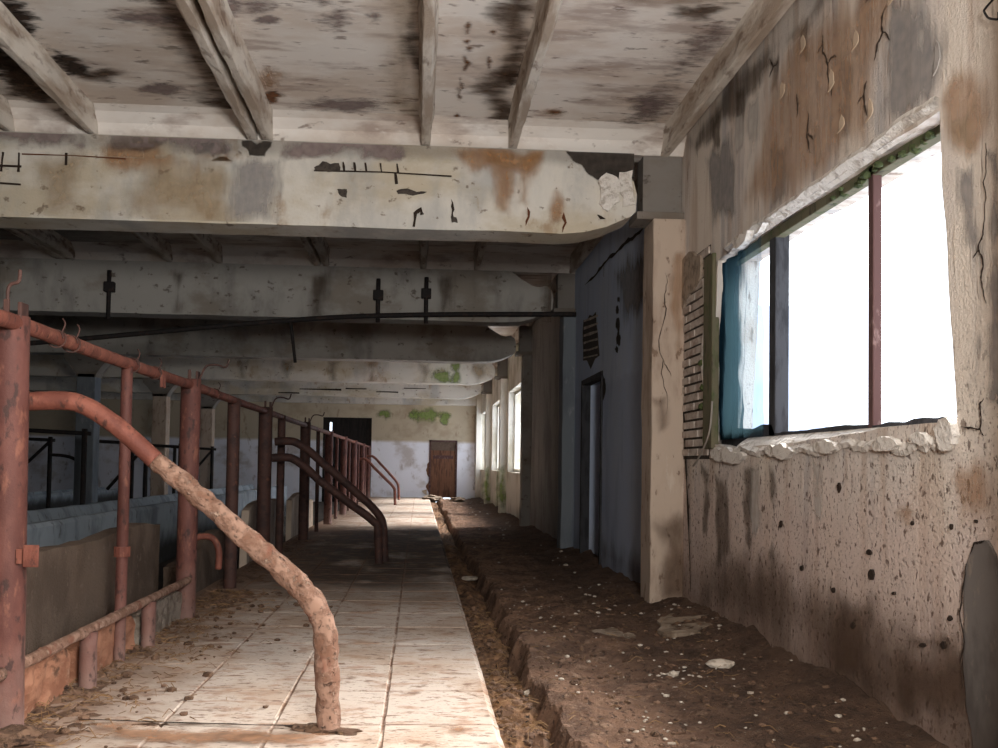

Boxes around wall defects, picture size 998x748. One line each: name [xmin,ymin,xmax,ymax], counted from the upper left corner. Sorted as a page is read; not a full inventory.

leakage [0,0,39,33]
leakage [0,48,52,103]
leakage [50,51,118,81]
leakage [475,0,531,120]
crack [857,0,890,115]
rust [462,149,541,204]
rust [552,199,562,219]
spalling [566,151,635,212]
crack [973,143,987,302]
crack [586,228,643,284]
flaking render [682,244,711,459]
peeling [947,540,998,748]